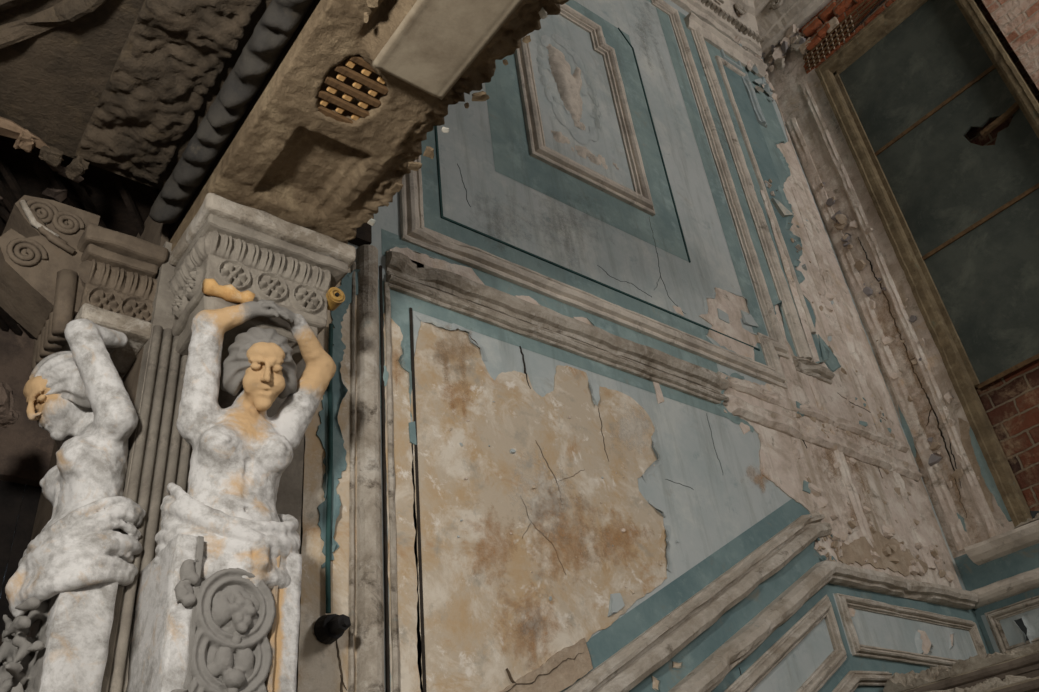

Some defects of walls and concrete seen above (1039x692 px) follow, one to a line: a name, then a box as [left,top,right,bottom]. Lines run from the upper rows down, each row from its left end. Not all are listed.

flaking render [0,117,89,180]
flaking render [363,0,379,23]
peeling [297,268,361,692]
peeling [379,313,679,692]
crack [520,496,566,574]
crack [535,440,585,505]
flaking render [716,0,1012,590]
crack [858,238,967,518]